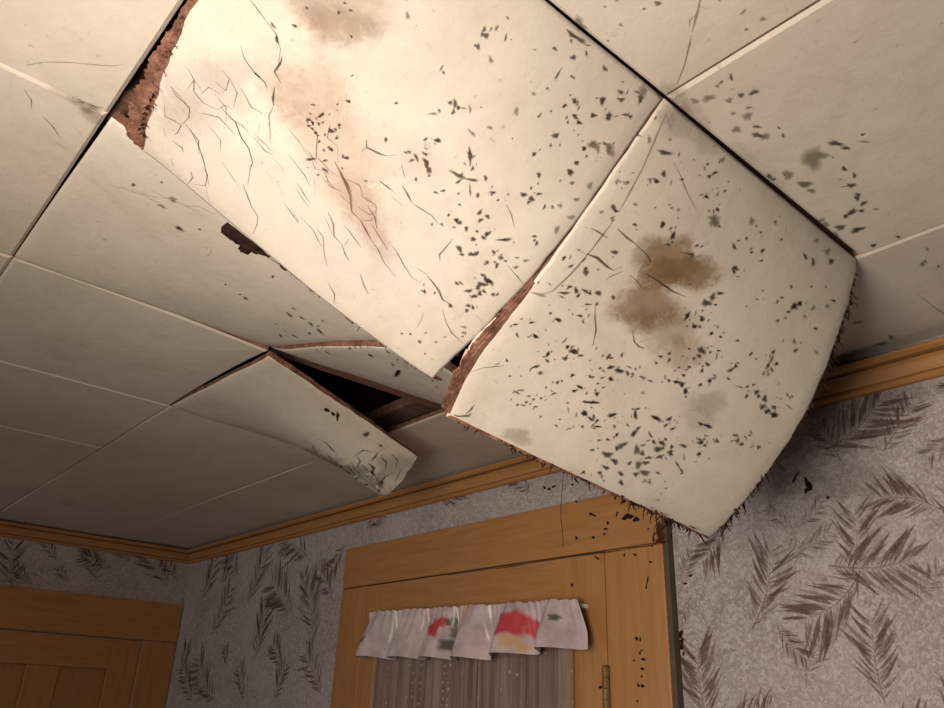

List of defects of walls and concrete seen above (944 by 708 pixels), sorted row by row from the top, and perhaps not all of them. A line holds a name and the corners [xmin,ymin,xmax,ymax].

crack [679,1,700,78]
spalling [221,222,270,258]
crack [164,3,459,340]
damp [431,149,528,312]
damp [622,221,793,417]
damp [509,339,719,485]